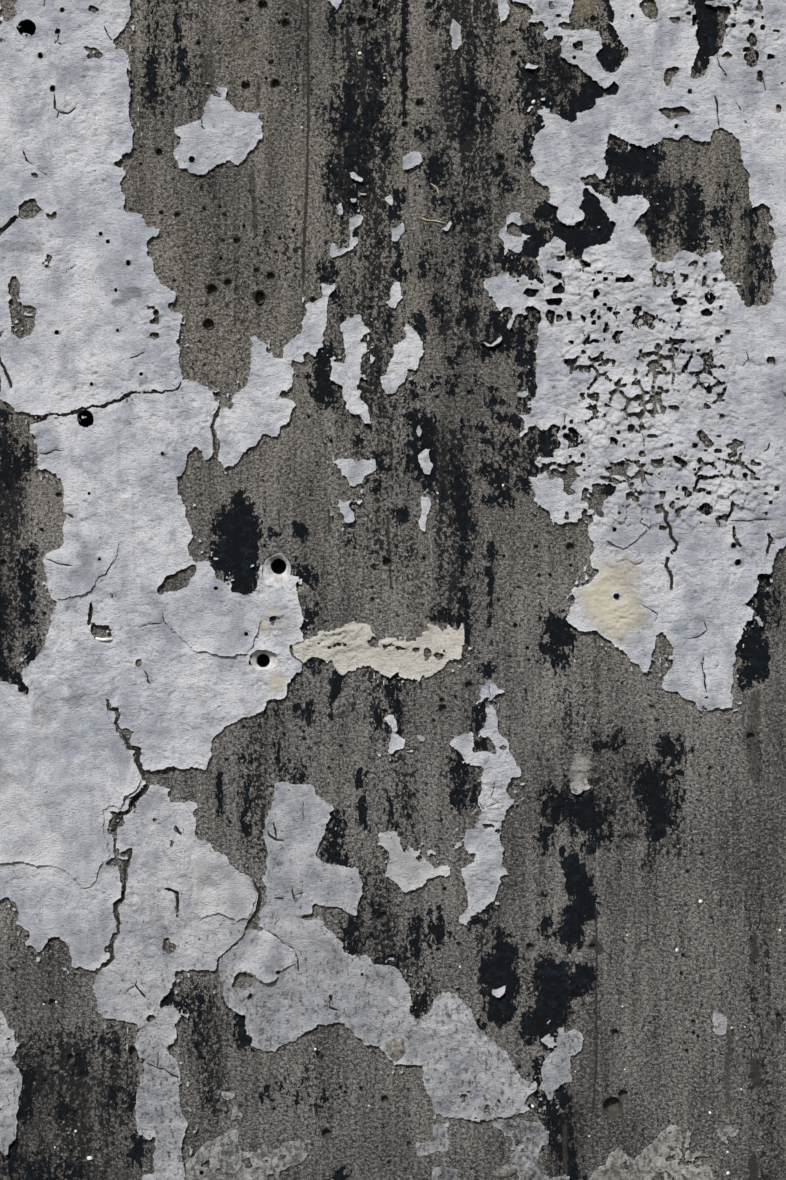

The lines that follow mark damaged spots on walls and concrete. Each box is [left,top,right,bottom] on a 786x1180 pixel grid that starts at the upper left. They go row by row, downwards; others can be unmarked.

crack [583,303,634,351]
peeling [483,0,786,715]
crack [33,379,183,423]
crack [725,442,770,469]
peeling [0,0,584,1180]
peeling [570,778,590,795]
crack [103,699,148,968]
crack [124,981,146,998]
peeling [713,1011,746,1035]
peeling [589,1125,730,1180]
peeling [717,1123,738,1153]